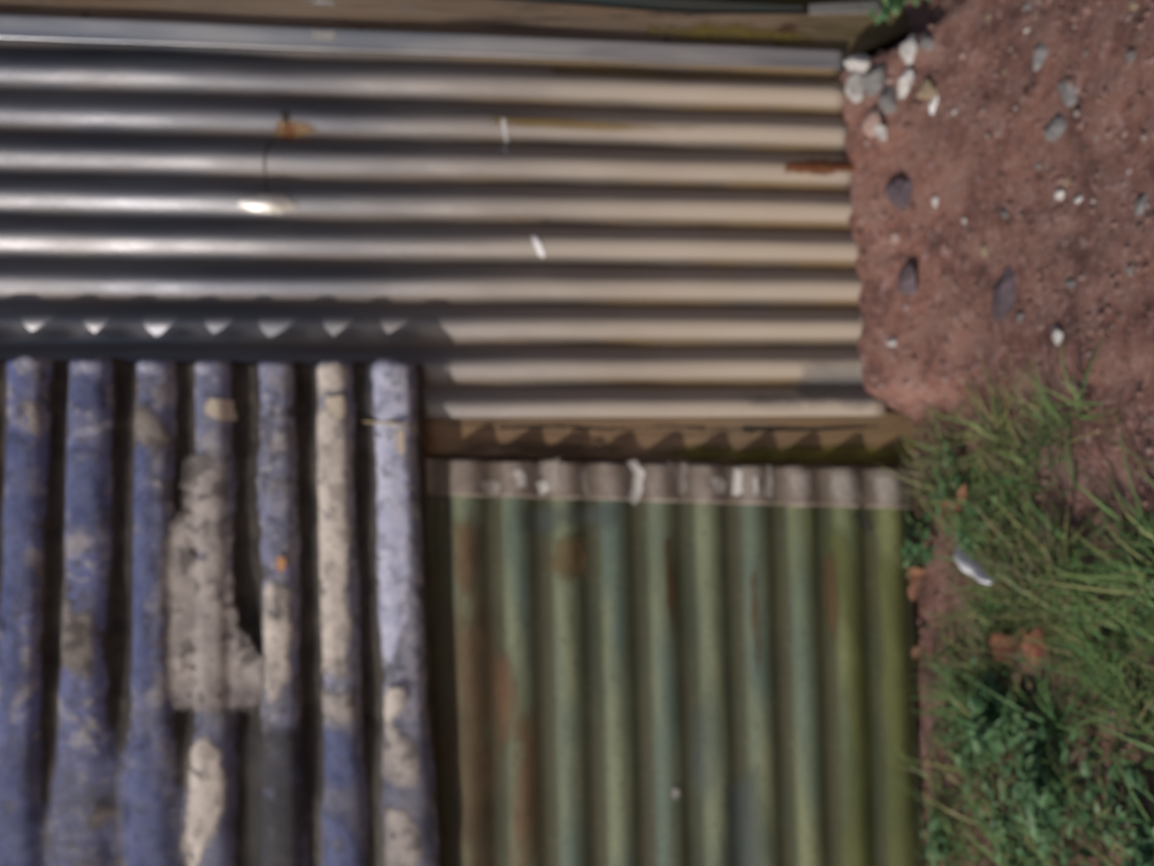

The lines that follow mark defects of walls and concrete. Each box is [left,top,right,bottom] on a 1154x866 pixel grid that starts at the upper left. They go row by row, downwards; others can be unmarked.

corrosion [276,121,313,139]
corrosion [785,159,855,175]
peeling [160,453,293,714]
peeling [180,739,228,866]